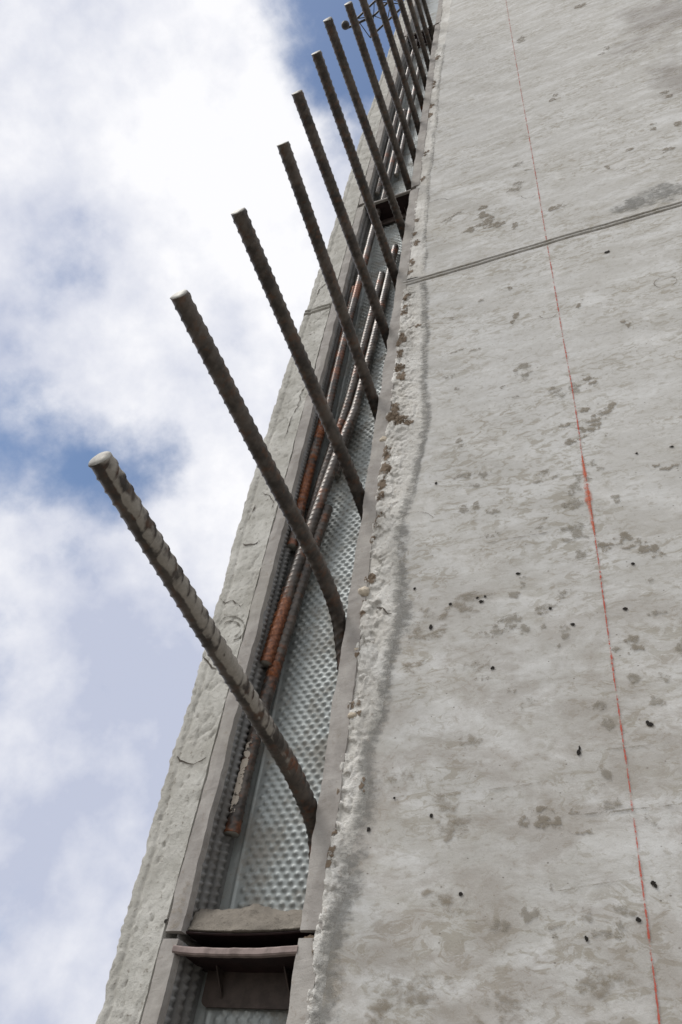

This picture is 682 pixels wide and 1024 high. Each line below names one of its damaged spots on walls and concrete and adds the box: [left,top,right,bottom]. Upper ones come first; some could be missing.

spalling [88,0,452,1024]
leakage [354,281,431,829]
leakage [312,851,366,1024]